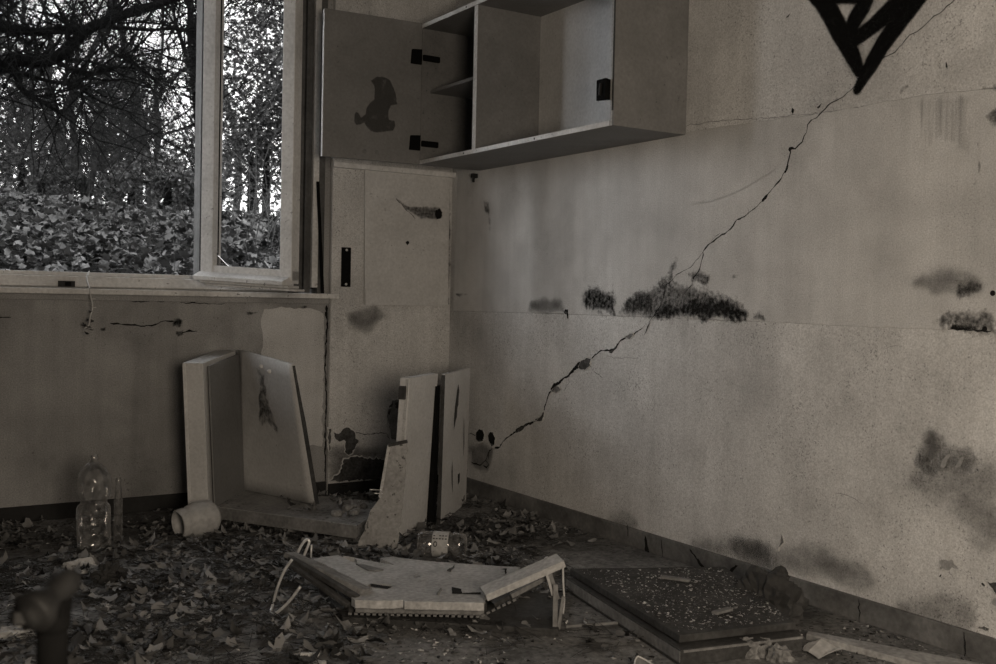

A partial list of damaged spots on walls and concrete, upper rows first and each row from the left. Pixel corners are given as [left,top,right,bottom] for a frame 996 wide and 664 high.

crack [495,0,954,449]
water stain [583,266,763,322]
water stain [941,313,993,333]
spalling [386,398,399,441]
spalling [326,426,385,483]
peeling [981,580,996,607]